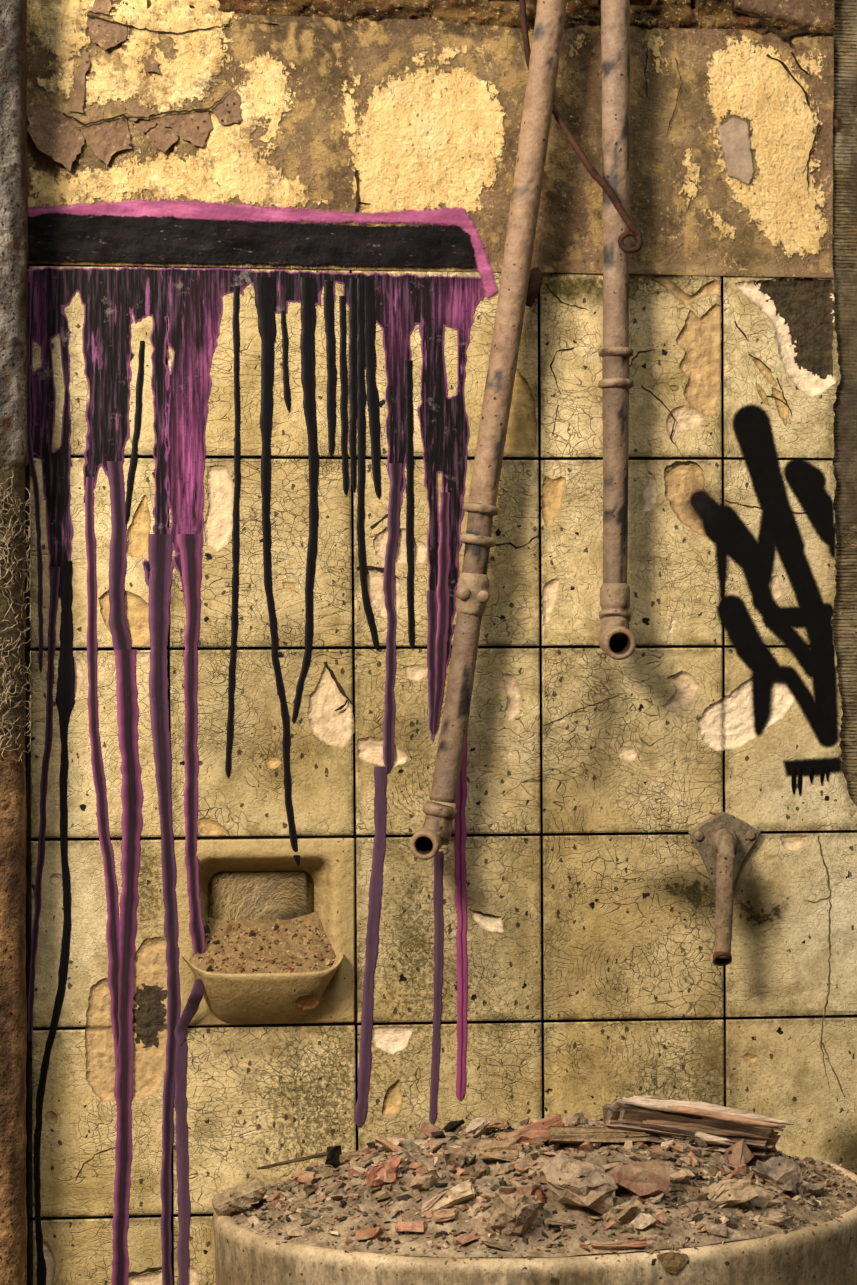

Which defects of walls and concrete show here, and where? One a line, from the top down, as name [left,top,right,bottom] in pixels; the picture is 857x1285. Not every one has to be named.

flaking render [26,0,330,209]
flaking render [339,41,511,226]
flaking render [678,35,834,260]
crack [629,349,704,472]
spalling [657,276,837,441]
crack [725,500,761,509]
spalling [307,665,412,767]
spalling [659,671,795,751]
spalling [85,978,116,1102]
spalling [132,936,168,1101]
crack [805,836,845,1097]